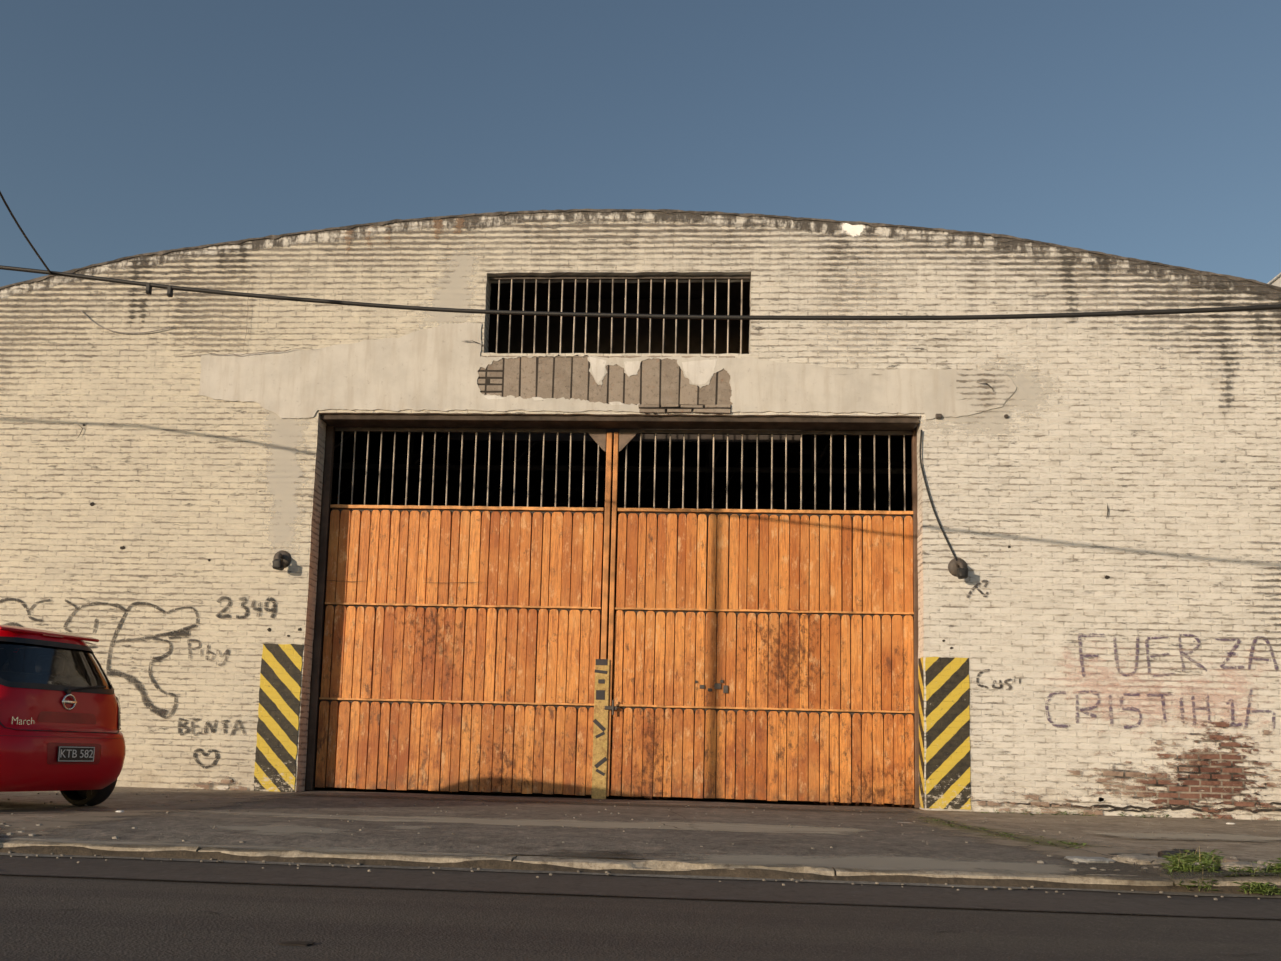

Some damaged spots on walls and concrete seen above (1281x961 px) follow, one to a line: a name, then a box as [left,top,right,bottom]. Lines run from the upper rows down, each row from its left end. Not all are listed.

water stain [893,227,1281,411]
spalling [477,355,735,415]
peeling [966,698,1281,820]